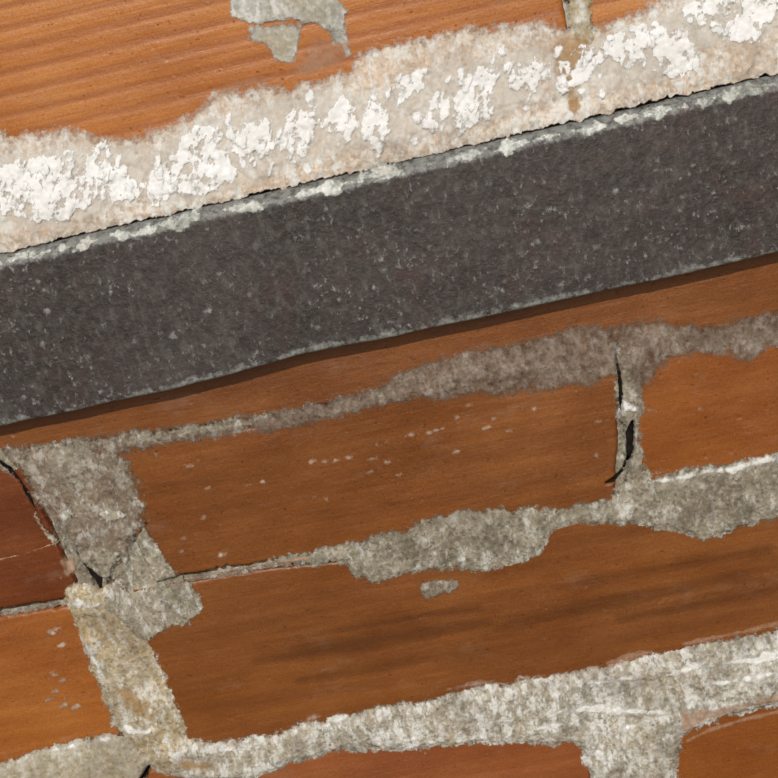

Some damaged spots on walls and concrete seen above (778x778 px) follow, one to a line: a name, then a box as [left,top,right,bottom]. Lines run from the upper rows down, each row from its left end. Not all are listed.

leakage [412,0,778,137]
leakage [0,68,427,224]
leakage [425,134,560,168]
leakage [109,208,212,242]
leakage [0,236,98,266]
crack [605,355,635,483]
crack [0,460,36,511]
crack [76,551,103,588]